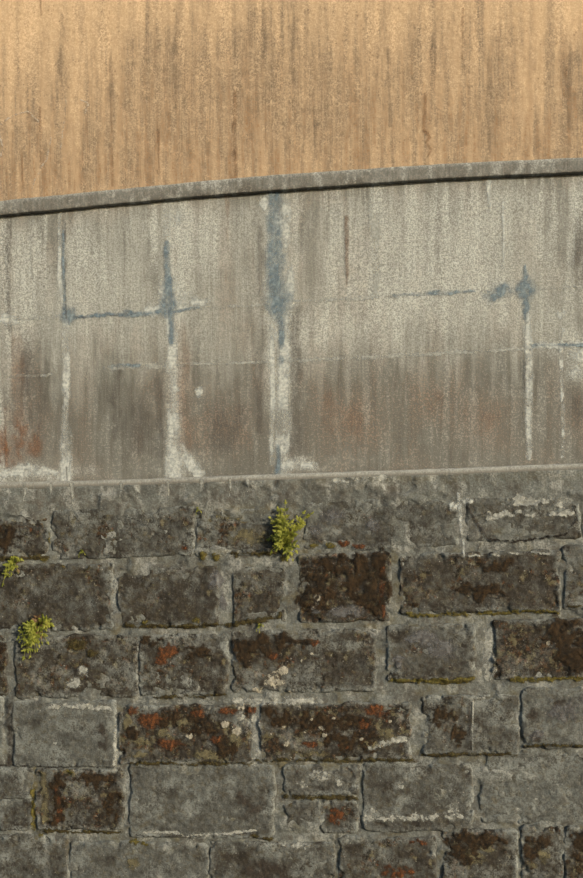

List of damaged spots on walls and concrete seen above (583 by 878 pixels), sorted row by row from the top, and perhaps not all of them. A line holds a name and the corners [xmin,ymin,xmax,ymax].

water stain [0,212,212,504]
water stain [227,192,339,410]
water stain [269,429,313,474]
water stain [485,265,583,460]